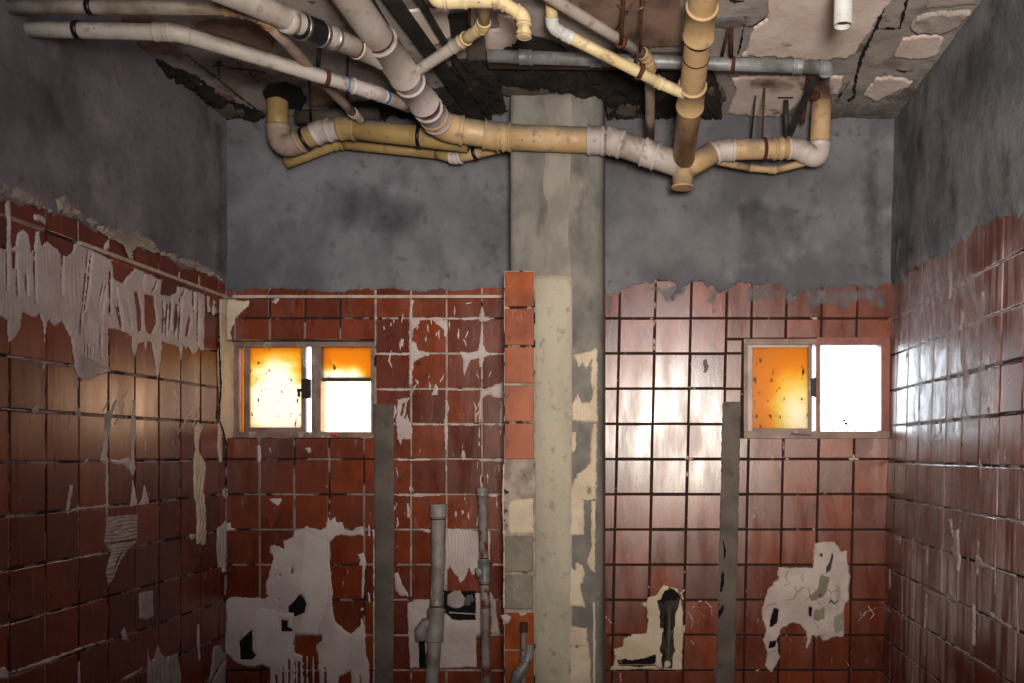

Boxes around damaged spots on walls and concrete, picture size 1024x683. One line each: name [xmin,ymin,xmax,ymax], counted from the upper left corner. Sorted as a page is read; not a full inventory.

spalling [136,40,307,122]
spalling [329,94,415,121]
spalling [432,12,681,120]
spalling [701,70,727,120]
crack [838,0,908,102]
spalling [831,84,919,119]
flaking render [0,183,223,285]
peeling [809,575,844,637]